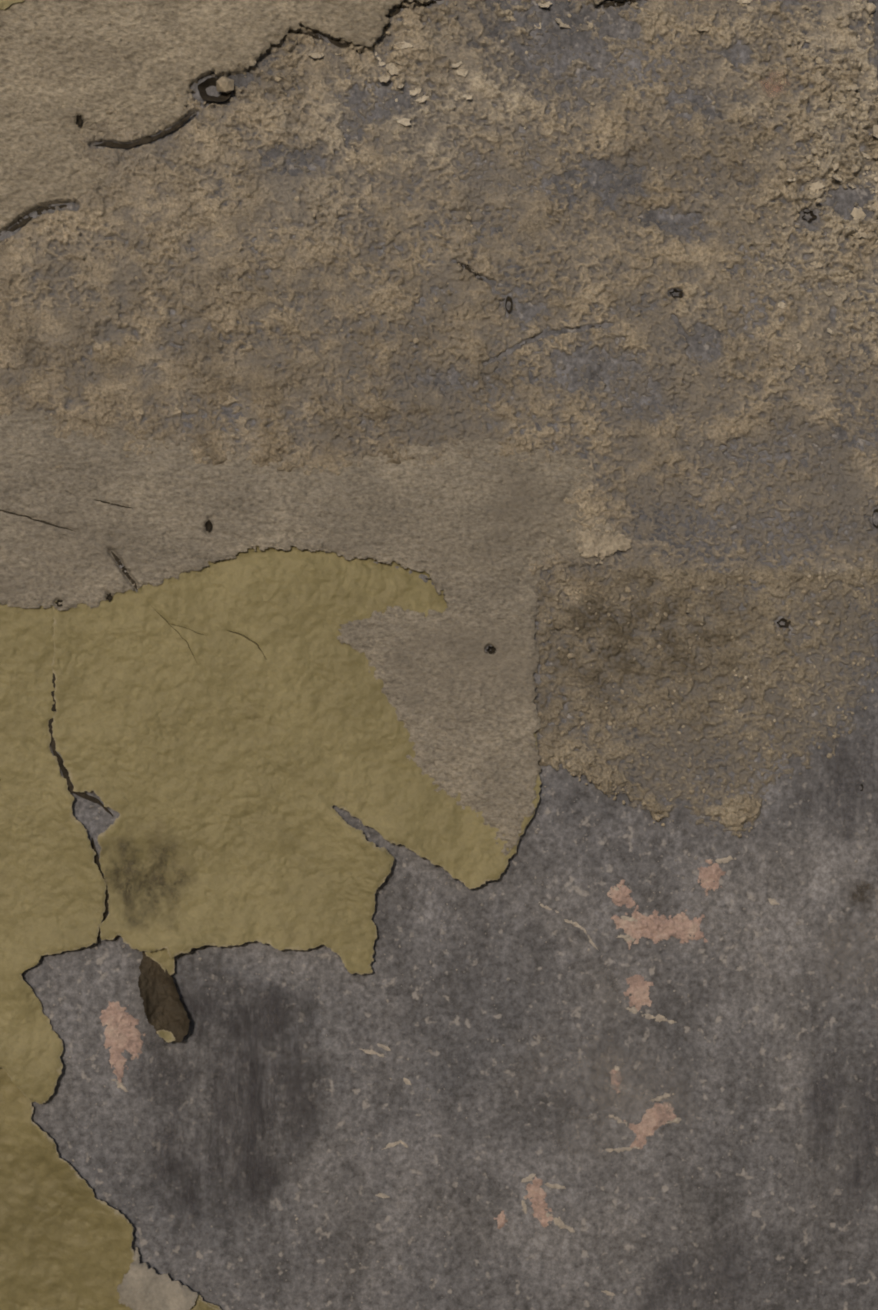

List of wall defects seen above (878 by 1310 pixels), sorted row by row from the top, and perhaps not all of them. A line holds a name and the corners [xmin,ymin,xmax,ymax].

crack [297,0,441,54]
crack [597,0,647,8]
crack [93,112,195,148]
crack [0,204,67,235]
spalling [0,0,878,1043]
crack [48,673,113,941]
peeling [0,604,222,1310]
peeling [606,1092,682,1152]
peeling [494,1211,508,1229]
peeling [521,1173,575,1232]